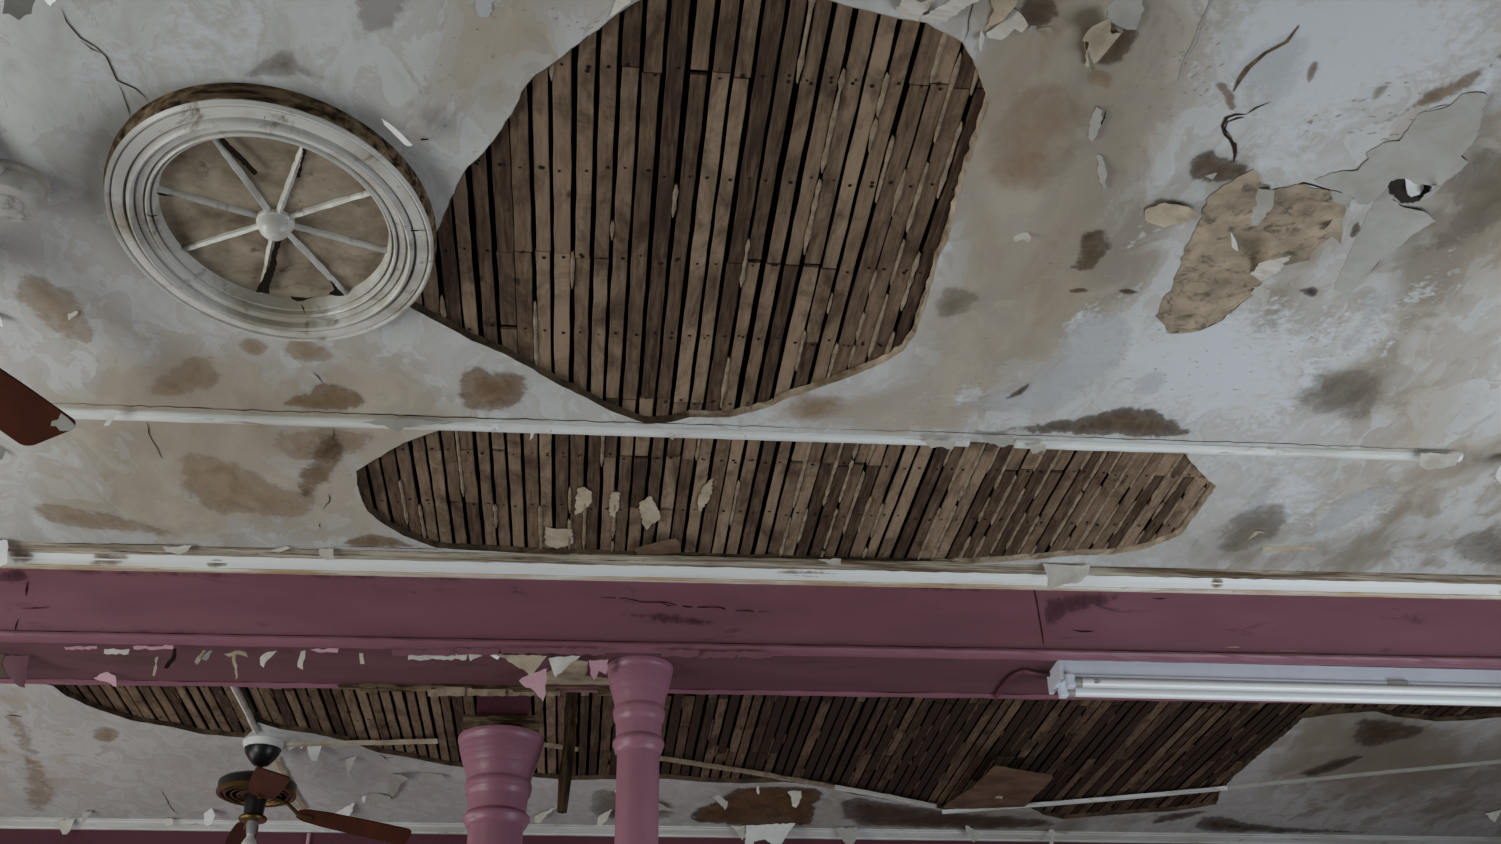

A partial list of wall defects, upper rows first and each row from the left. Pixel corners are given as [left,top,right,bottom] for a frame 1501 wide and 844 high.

crack [62,11,148,118]
crack [1221,26,1299,162]
spalling [1145,92,1488,334]
spalling [356,0,1216,565]
damp [194,434,354,510]
damp [461,369,523,409]
damp [1015,408,1189,437]
damp [1323,379,1362,407]
spalling [46,645,477,816]
spalling [392,647,617,827]
spalling [659,693,1501,844]